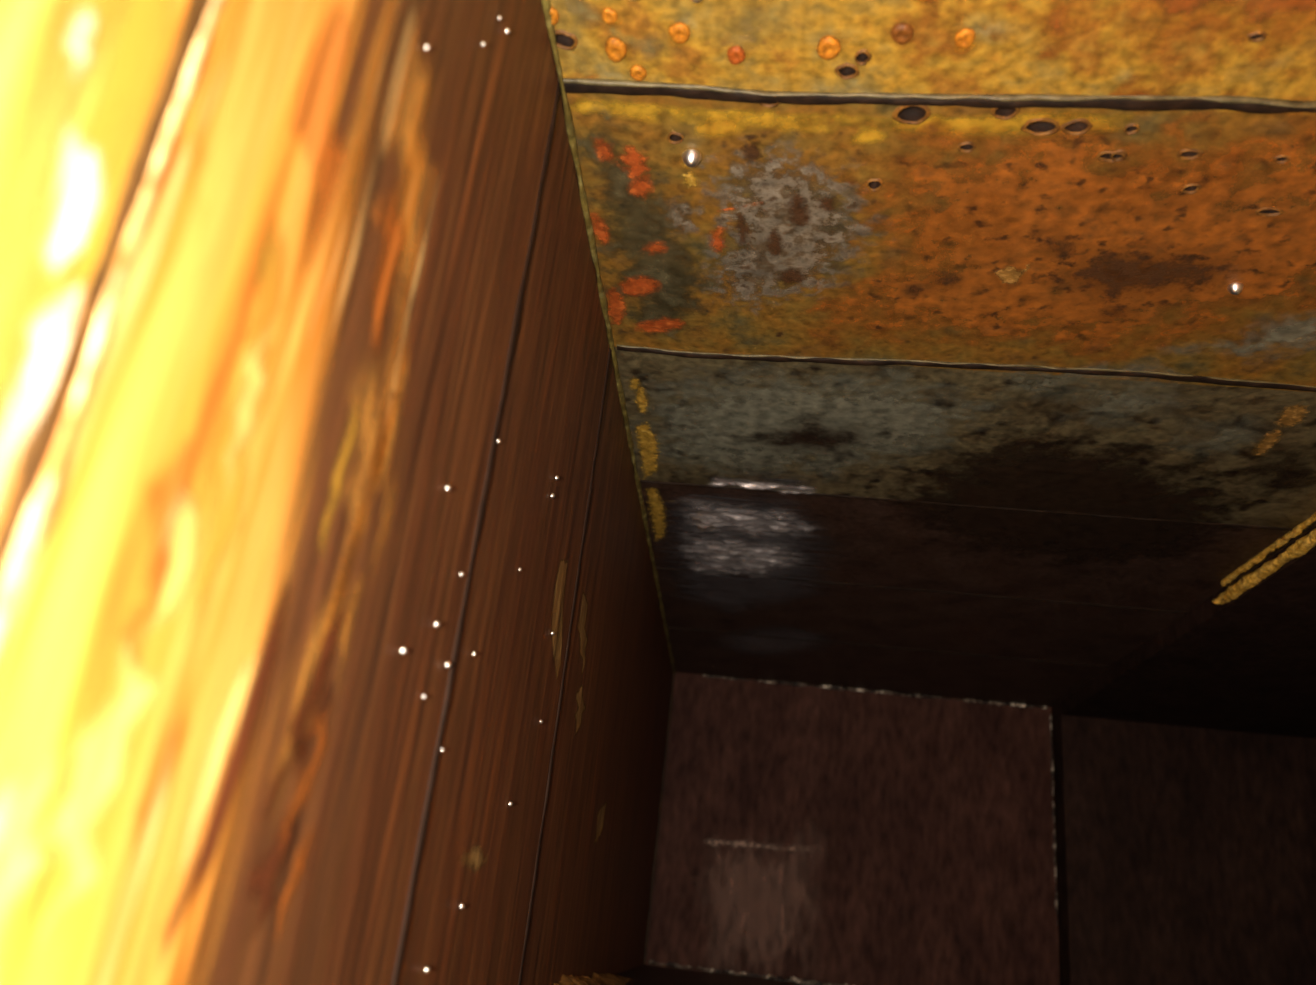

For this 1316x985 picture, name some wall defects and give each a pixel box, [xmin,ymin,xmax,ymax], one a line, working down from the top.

rust [602,7,647,81]
rust [669,22,690,44]
rust [817,35,841,60]
rust [890,23,914,44]
rust [954,28,976,52]
rust [576,101,819,159]
rust [596,141,651,197]
damp [683,164,697,187]
rust [807,113,1316,355]
rust [606,276,660,325]
rust [637,317,684,332]
rust [1254,405,1309,455]